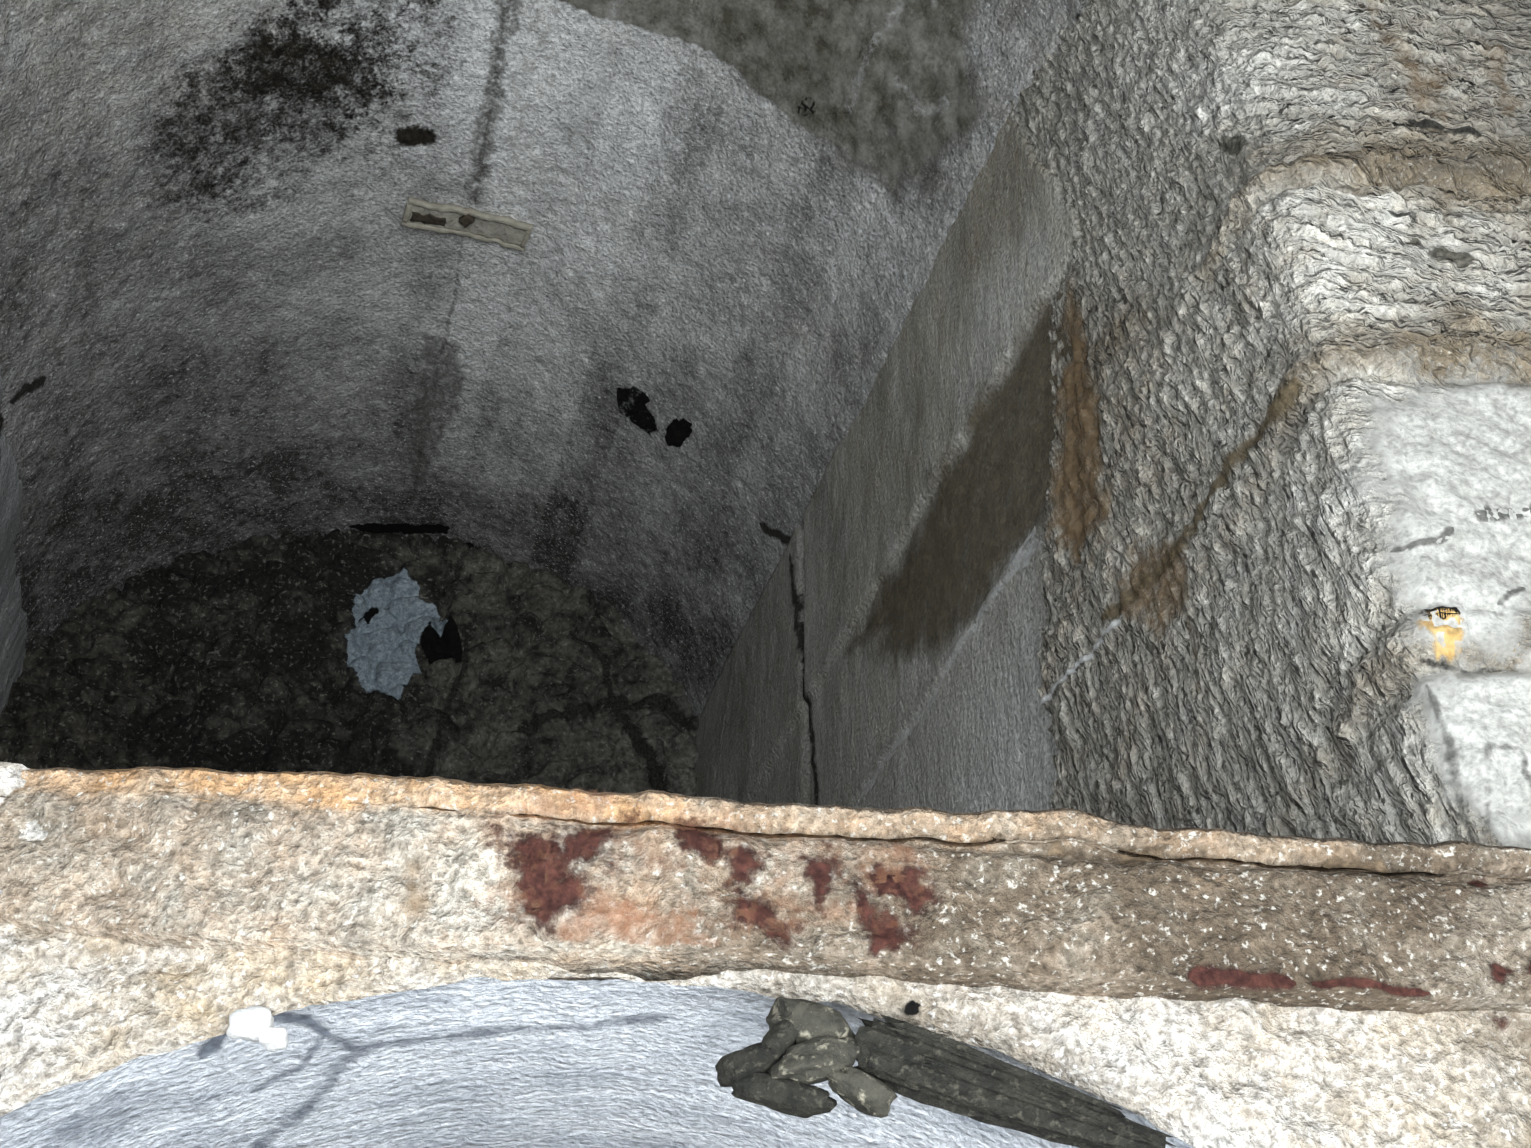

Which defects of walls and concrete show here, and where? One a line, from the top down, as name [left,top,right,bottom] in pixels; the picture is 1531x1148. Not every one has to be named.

leakage [155,0,454,210]
leakage [560,0,981,196]
crack [0,376,46,449]
leakage [864,292,1073,662]
flaking render [344,568,463,700]
crack [759,521,819,805]
corrosion [487,810,678,940]
corrosion [674,817,803,951]
corrosion [797,840,942,957]